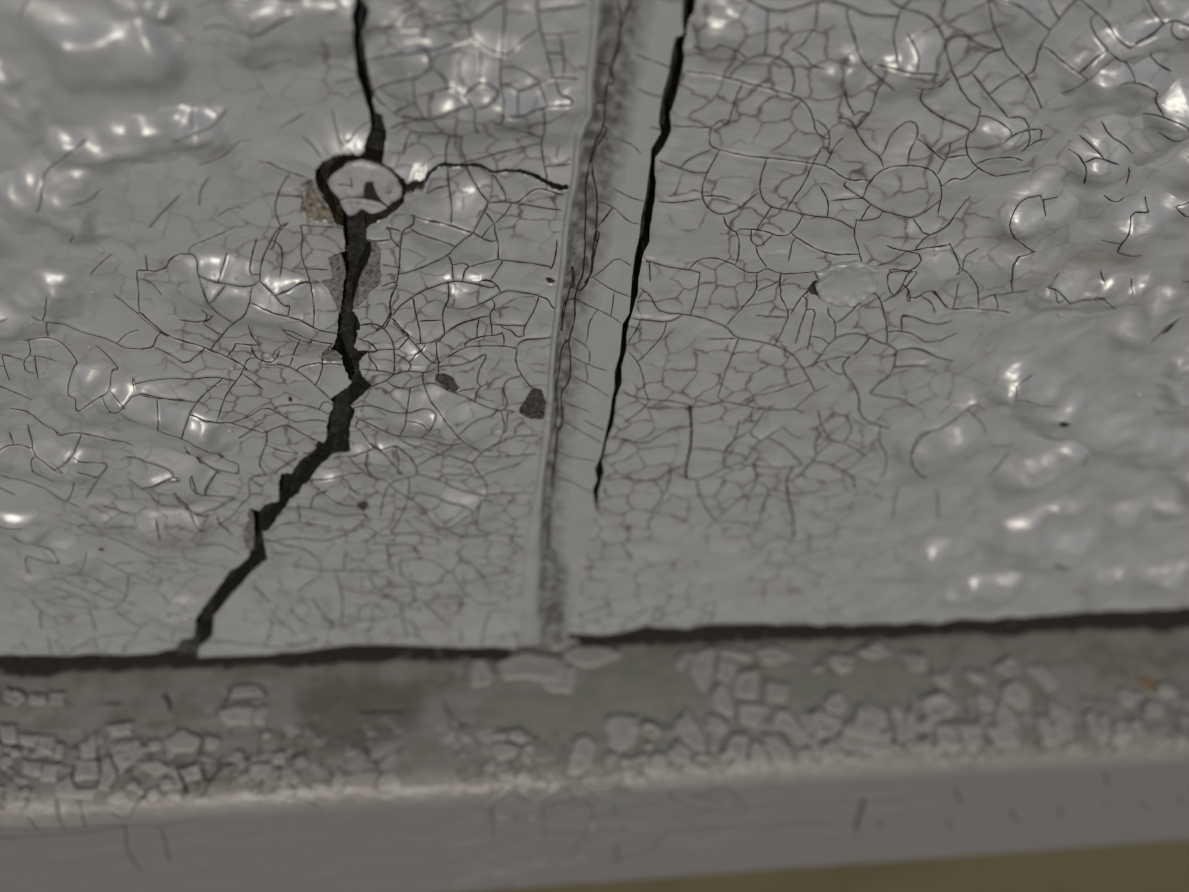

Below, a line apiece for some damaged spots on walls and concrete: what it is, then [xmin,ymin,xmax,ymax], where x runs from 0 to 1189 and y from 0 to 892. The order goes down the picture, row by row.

crack [0,0,1189,680]
peeling [470,637,624,693]
peeling [3,688,66,706]
peeling [217,684,272,739]
peeling [566,642,1189,776]
peeling [0,722,221,800]
peeling [229,750,287,783]
peeling [491,728,535,764]
crack [0,751,306,873]